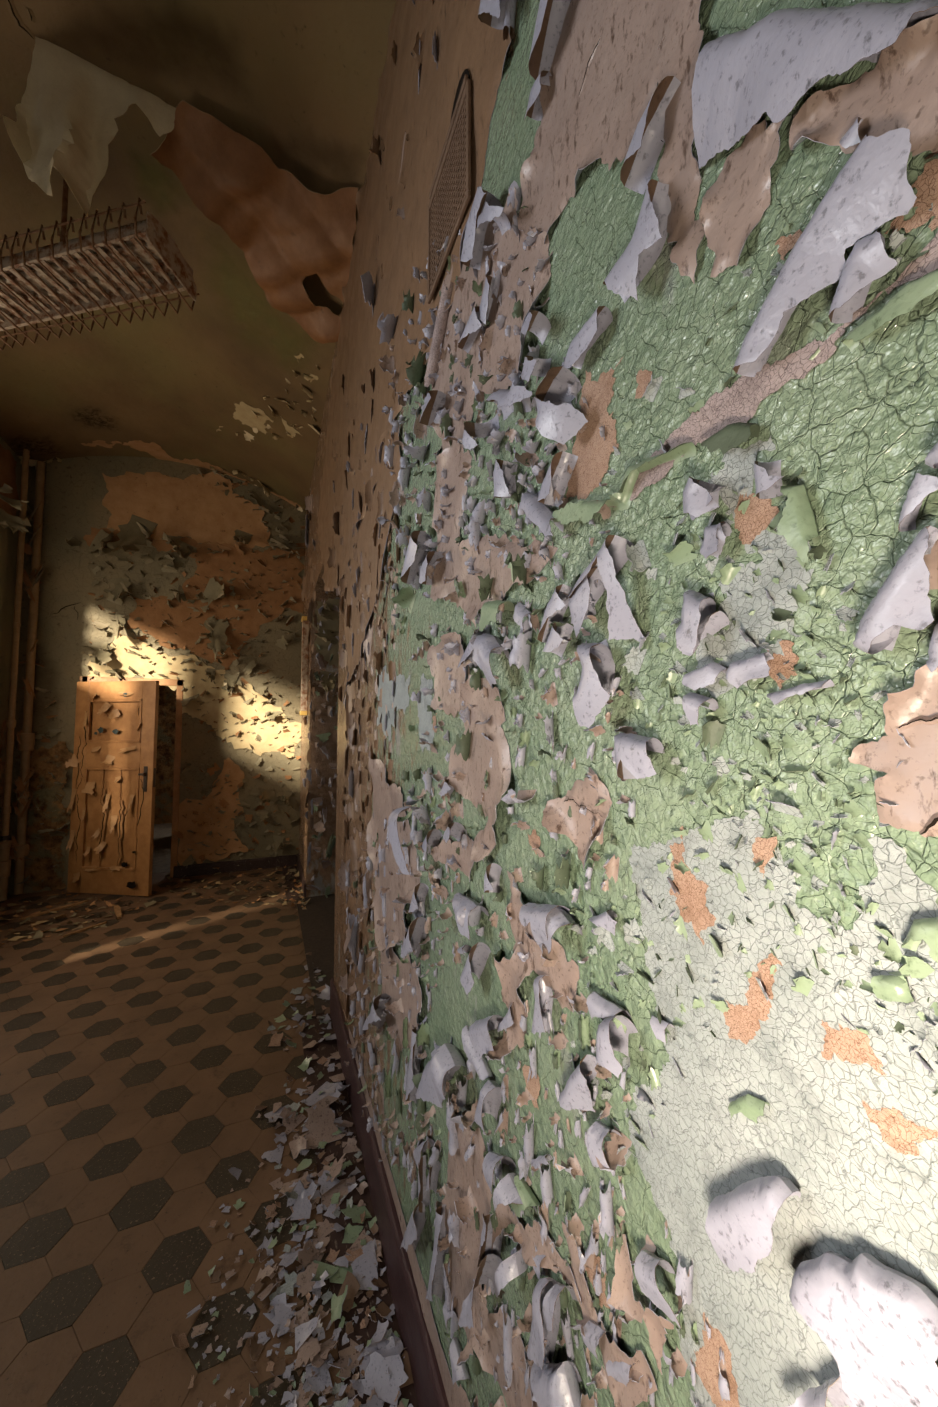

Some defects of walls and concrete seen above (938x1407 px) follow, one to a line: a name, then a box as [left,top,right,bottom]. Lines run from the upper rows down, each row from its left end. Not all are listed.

peeling [841,270,938,352]
peeling [233,367,320,442]
peeling [515,682,568,771]
peeling [602,705,668,781]
crack [898,714,938,730]
peeling [65,746,134,883]
peeling [168,757,330,910]
peeling [541,767,636,903]
peeling [801,786,866,870]
crack [919,813,938,838]
peeling [484,863,503,903]
peeling [588,905,618,952]